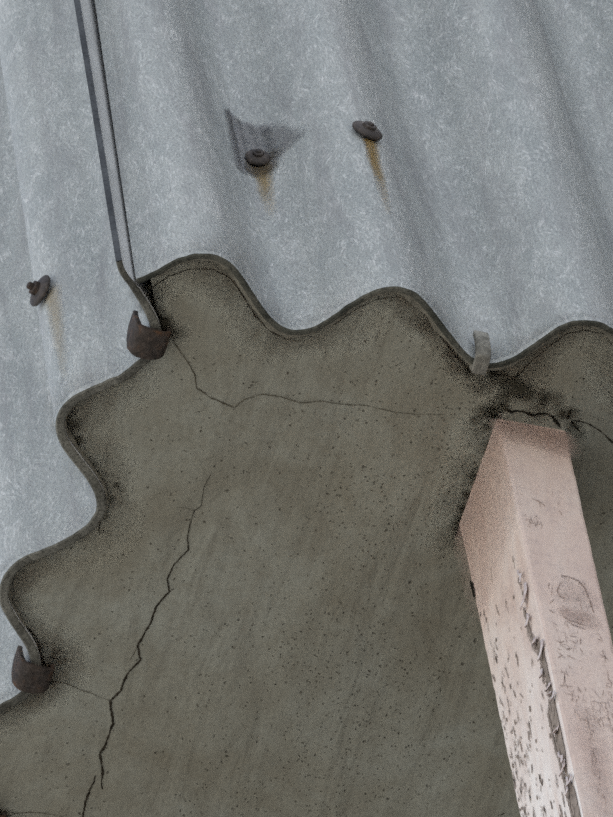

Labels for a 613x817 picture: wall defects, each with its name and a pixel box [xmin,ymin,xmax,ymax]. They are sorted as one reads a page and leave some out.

corrosion [366,138,381,178]
crack [171,332,443,415]
damp [472,371,573,422]
crack [504,408,613,443]
crack [52,477,210,817]